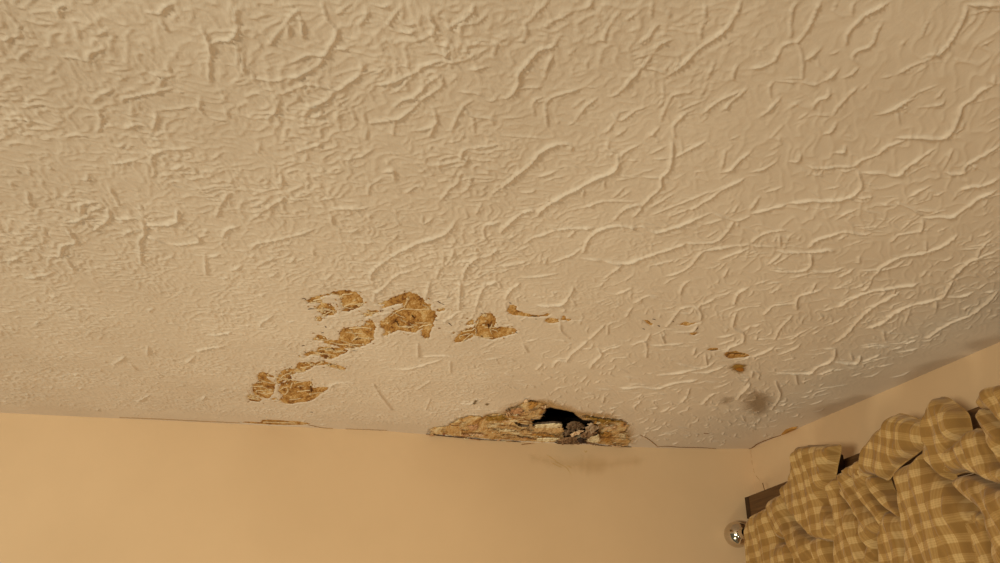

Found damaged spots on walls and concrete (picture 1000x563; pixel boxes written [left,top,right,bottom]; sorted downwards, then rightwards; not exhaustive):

peeling [243,289,576,425]
spalling [429,399,631,447]